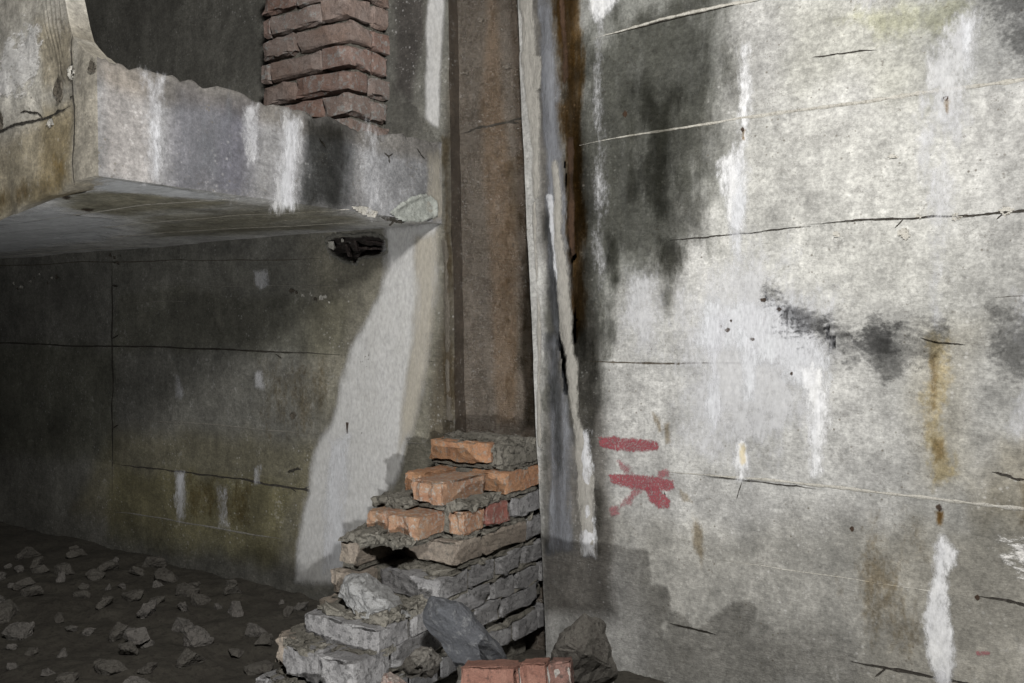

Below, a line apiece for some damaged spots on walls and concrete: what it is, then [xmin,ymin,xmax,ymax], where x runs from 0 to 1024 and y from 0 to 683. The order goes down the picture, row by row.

efflorescence [590,0,615,21]
peeling [0,23,42,99]
spalling [53,60,96,103]
crack [0,36,75,185]
efflorescence [274,116,302,208]
efflorescence [717,46,752,260]
damp [95,178,219,199]
crack [677,209,1024,240]
hole [325,232,388,266]
crack [707,476,813,497]
efflorescence [923,536,956,683]
crack [851,661,968,683]